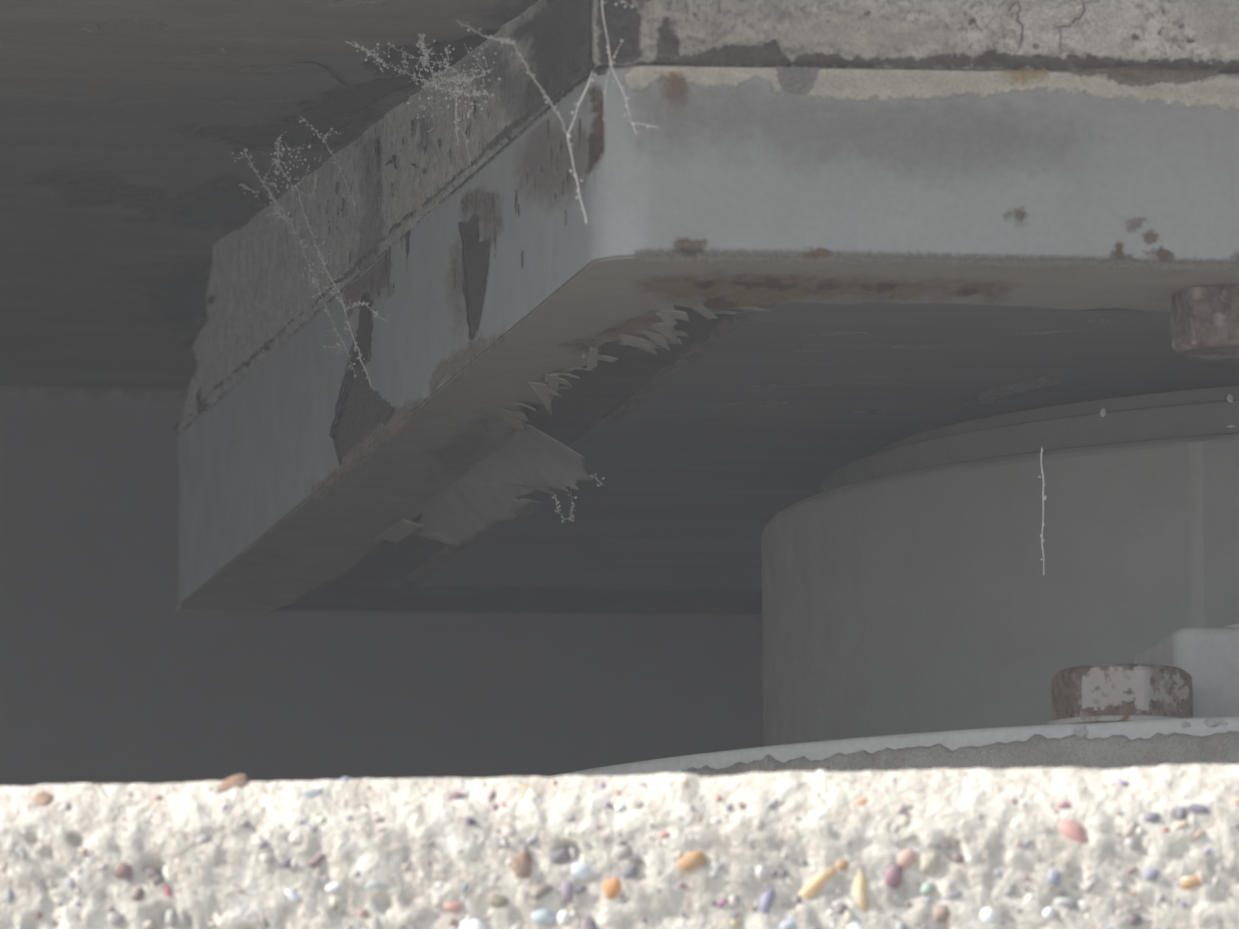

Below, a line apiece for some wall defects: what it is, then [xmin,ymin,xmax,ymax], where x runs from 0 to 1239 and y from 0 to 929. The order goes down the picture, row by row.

crack [1006,1,1086,54]
peeling [458,214,490,341]
rust [1111,243,1132,260]
rust [1130,219,1173,261]
peeling [175,256,1239,612]